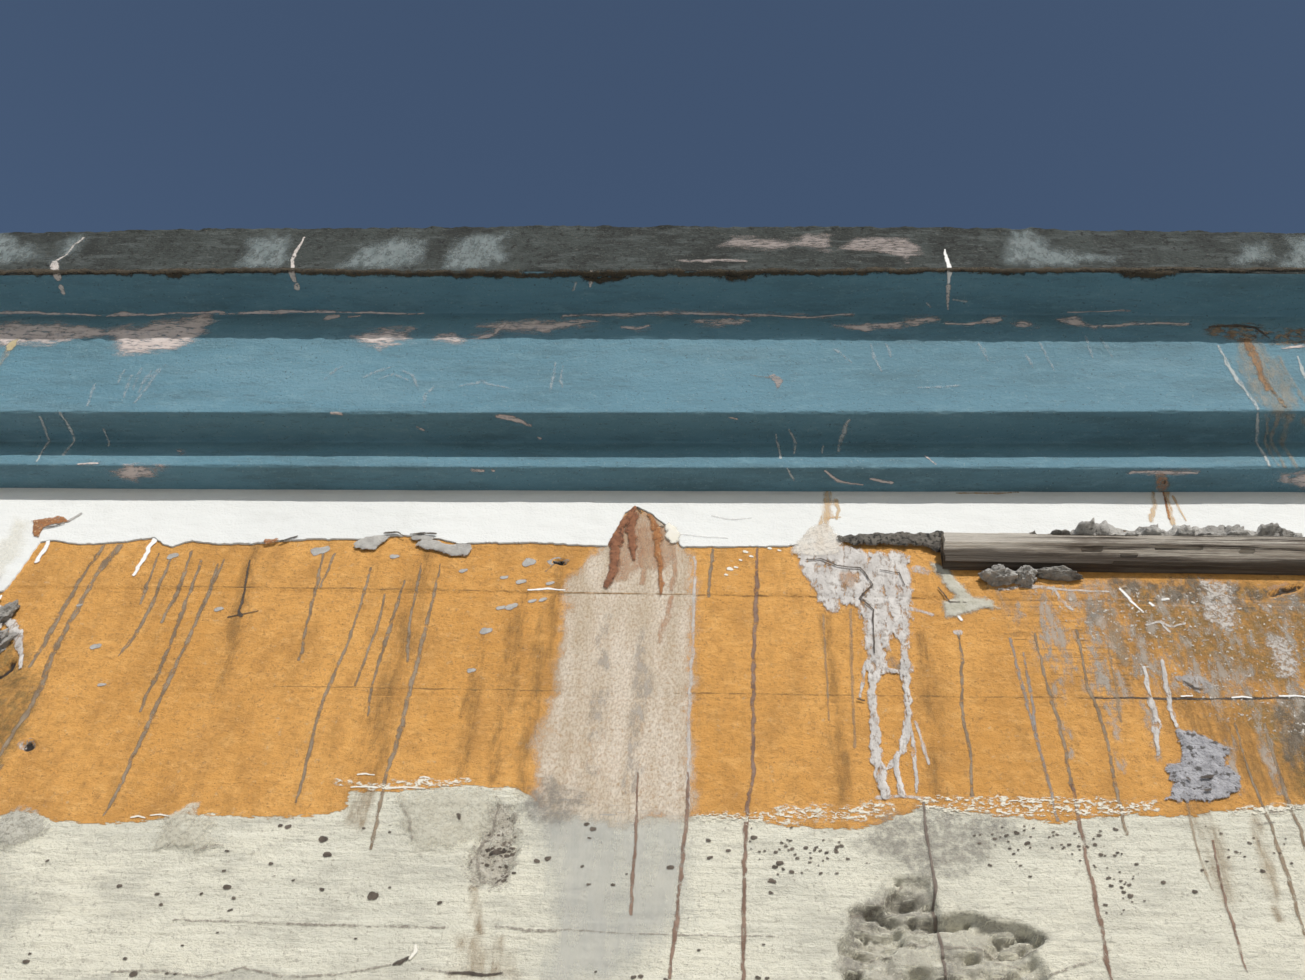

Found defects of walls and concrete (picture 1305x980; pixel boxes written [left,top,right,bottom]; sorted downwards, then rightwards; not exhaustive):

peeling [0,310,424,353]
rust [1205,323,1305,487]
spalling [354,531,472,584]
rust [603,506,680,643]
water stain [791,530,998,799]
spalling [1034,584,1305,733]
spalling [334,768,472,791]
spalling [461,800,531,889]
water stain [526,511,714,979]
spalling [695,800,895,894]
spalling [916,728,1305,914]
spalling [837,876,1084,980]